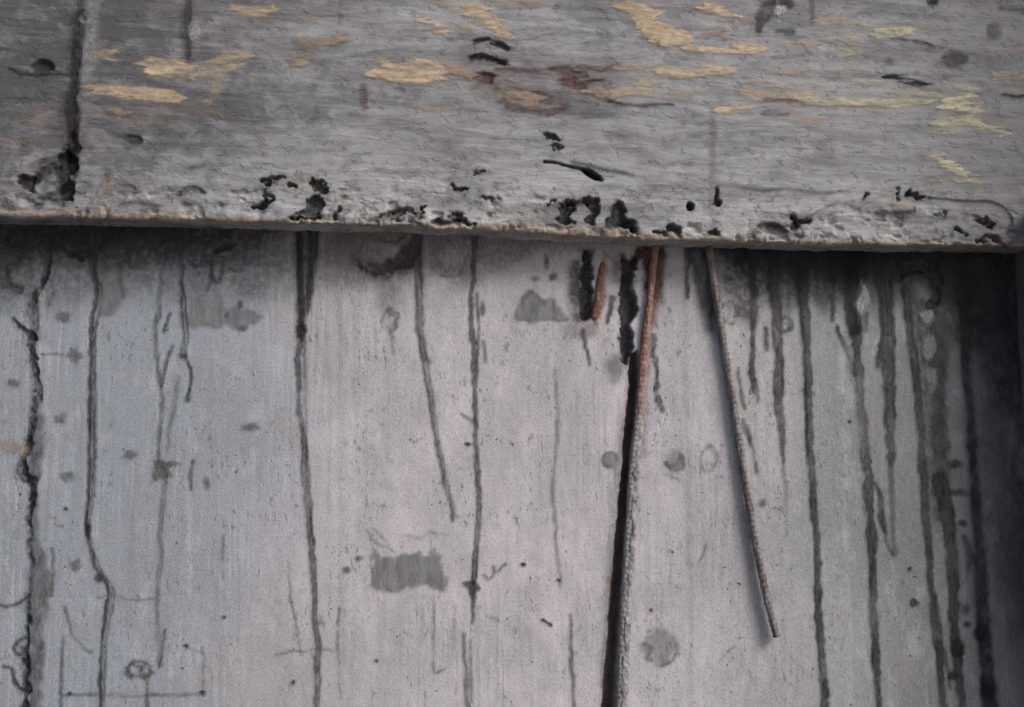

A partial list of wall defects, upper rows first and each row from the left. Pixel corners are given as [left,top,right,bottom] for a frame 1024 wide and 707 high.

crack [12,9,85,152]
crack [2,240,54,707]
crack [70,226,109,707]
corrosion [631,247,665,321]
crack [651,336,664,412]
spalling [705,246,781,638]
water stain [685,247,1022,707]